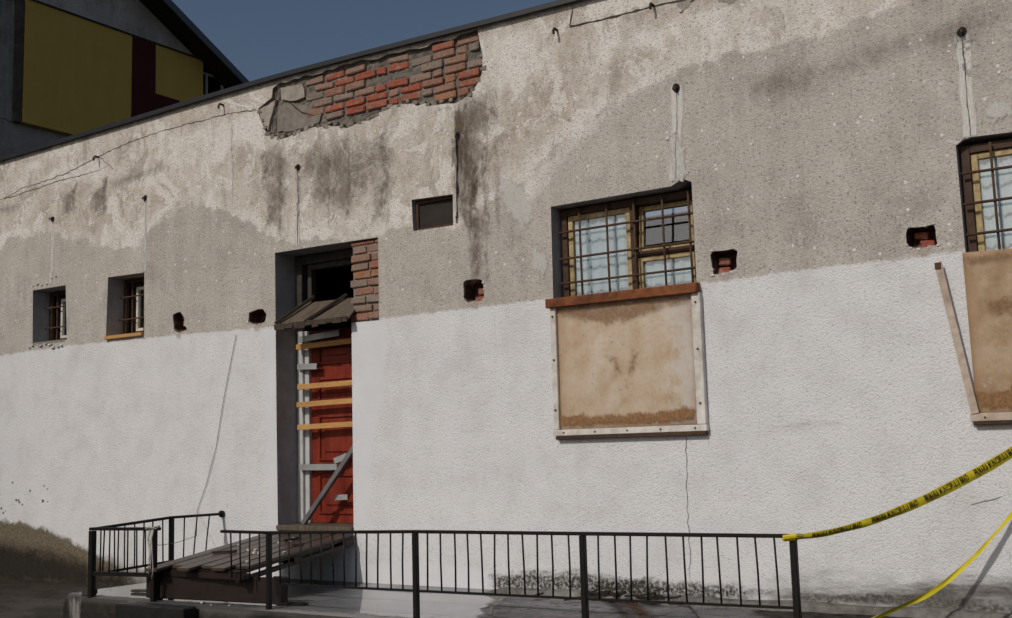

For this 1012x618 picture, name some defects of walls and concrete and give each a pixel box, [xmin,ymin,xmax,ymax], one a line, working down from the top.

crack [570,0,685,28]
spalling [257,31,486,140]
crack [0,109,255,200]
water stain [455,106,487,222]
hole [904,222,940,255]
hole [710,249,738,280]
hole [462,279,485,308]
hole [172,312,189,337]
water stain [0,521,133,586]